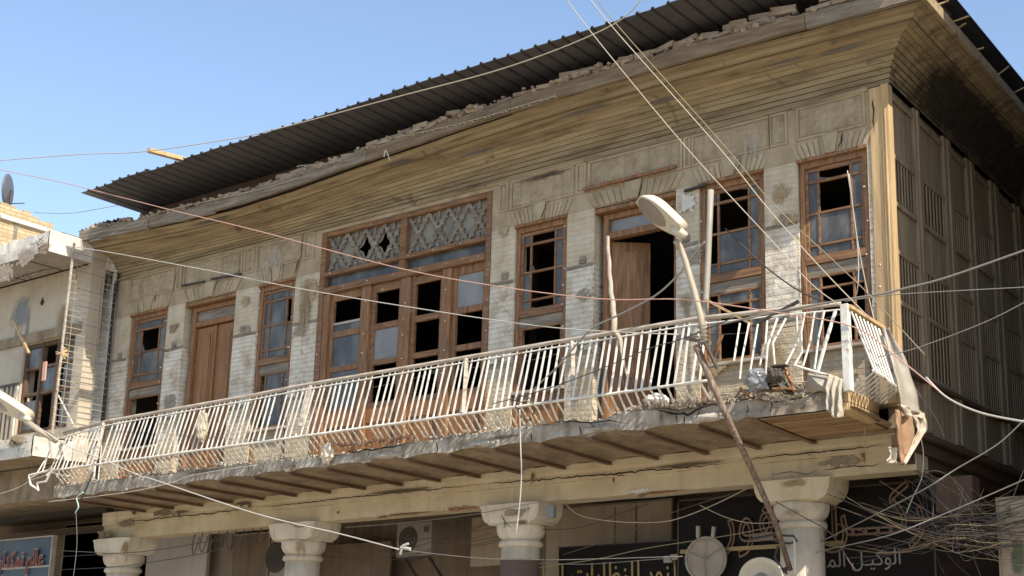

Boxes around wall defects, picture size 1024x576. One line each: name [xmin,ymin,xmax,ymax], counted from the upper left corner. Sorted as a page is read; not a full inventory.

peeling [679,194,695,213]
peeling [770,182,799,228]
crack [656,403,715,425]
peeling [818,455,864,468]
crack [136,442,877,528]